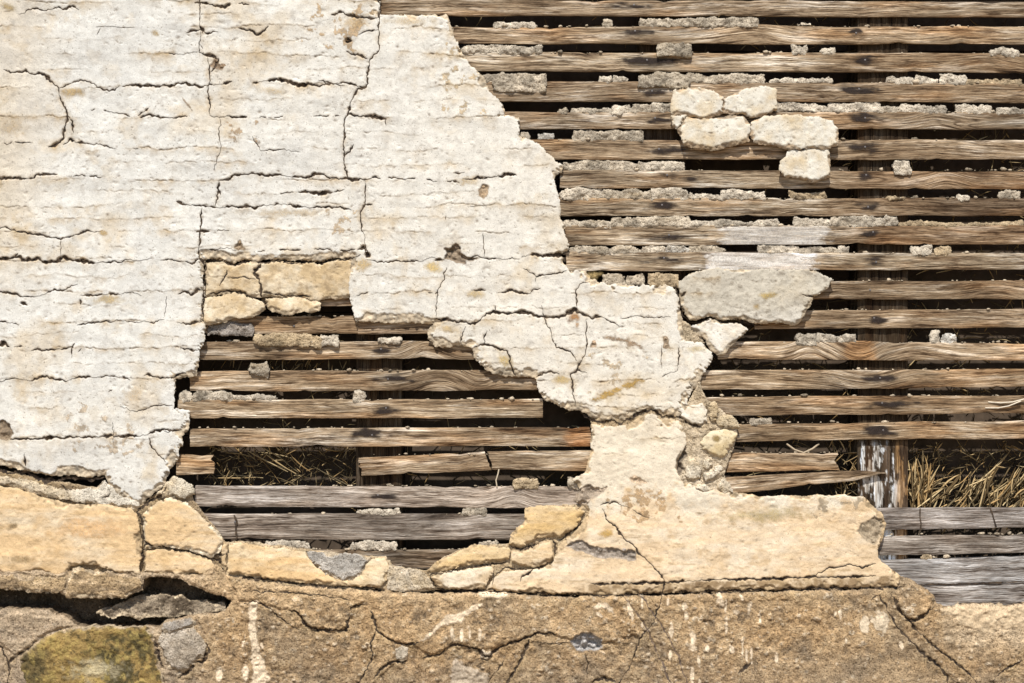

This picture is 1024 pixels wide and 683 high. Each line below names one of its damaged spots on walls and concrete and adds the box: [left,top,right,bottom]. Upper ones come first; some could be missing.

peeling [308,3,373,52]
peeling [442,43,477,91]
spalling [478,184,489,198]
crack [0,0,760,504]
spalling [435,244,478,264]
peeling [588,340,622,385]
spalling [677,451,687,475]
peeling [574,475,666,523]
spalling [567,540,636,561]
spalling [858,516,884,545]
crack [136,487,1024,683]
crack [0,642,35,683]